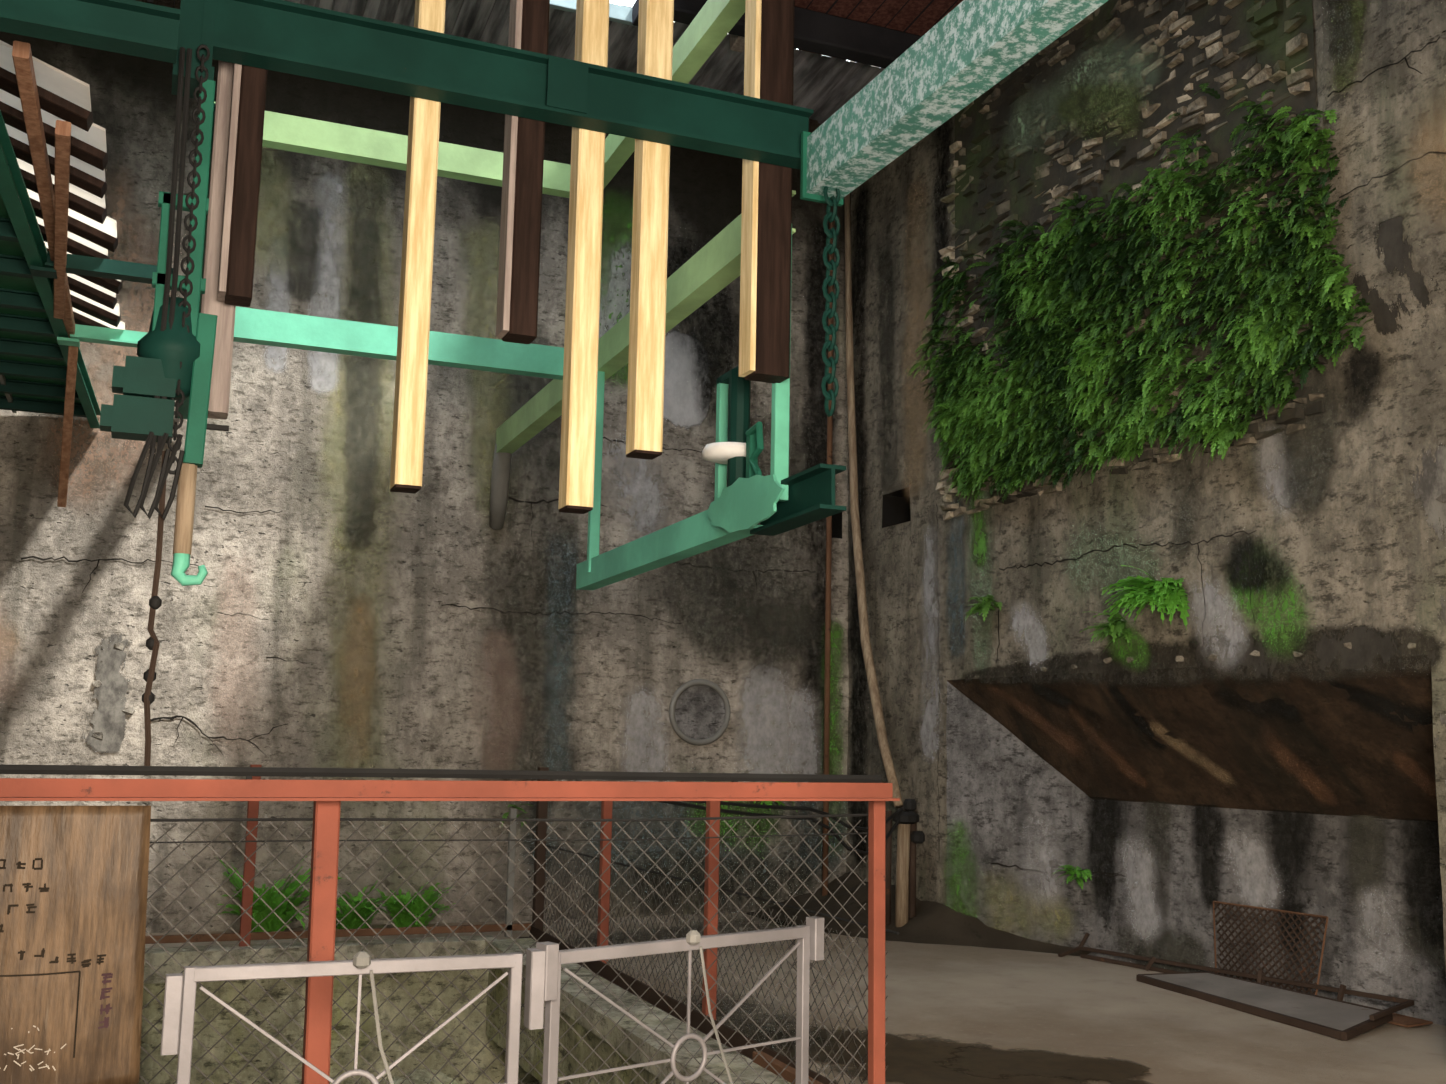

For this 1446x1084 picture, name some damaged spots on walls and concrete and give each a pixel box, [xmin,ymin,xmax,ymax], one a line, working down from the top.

damp [1262,350,1382,514]
damp [1012,608,1046,664]
damp [1192,536,1288,657]
damp [1088,797,1205,972]
damp [1194,804,1312,953]
damp [1350,815,1385,941]
damp [1399,818,1446,977]
damp [691,995,868,1080]
damp [885,1033,1152,1084]